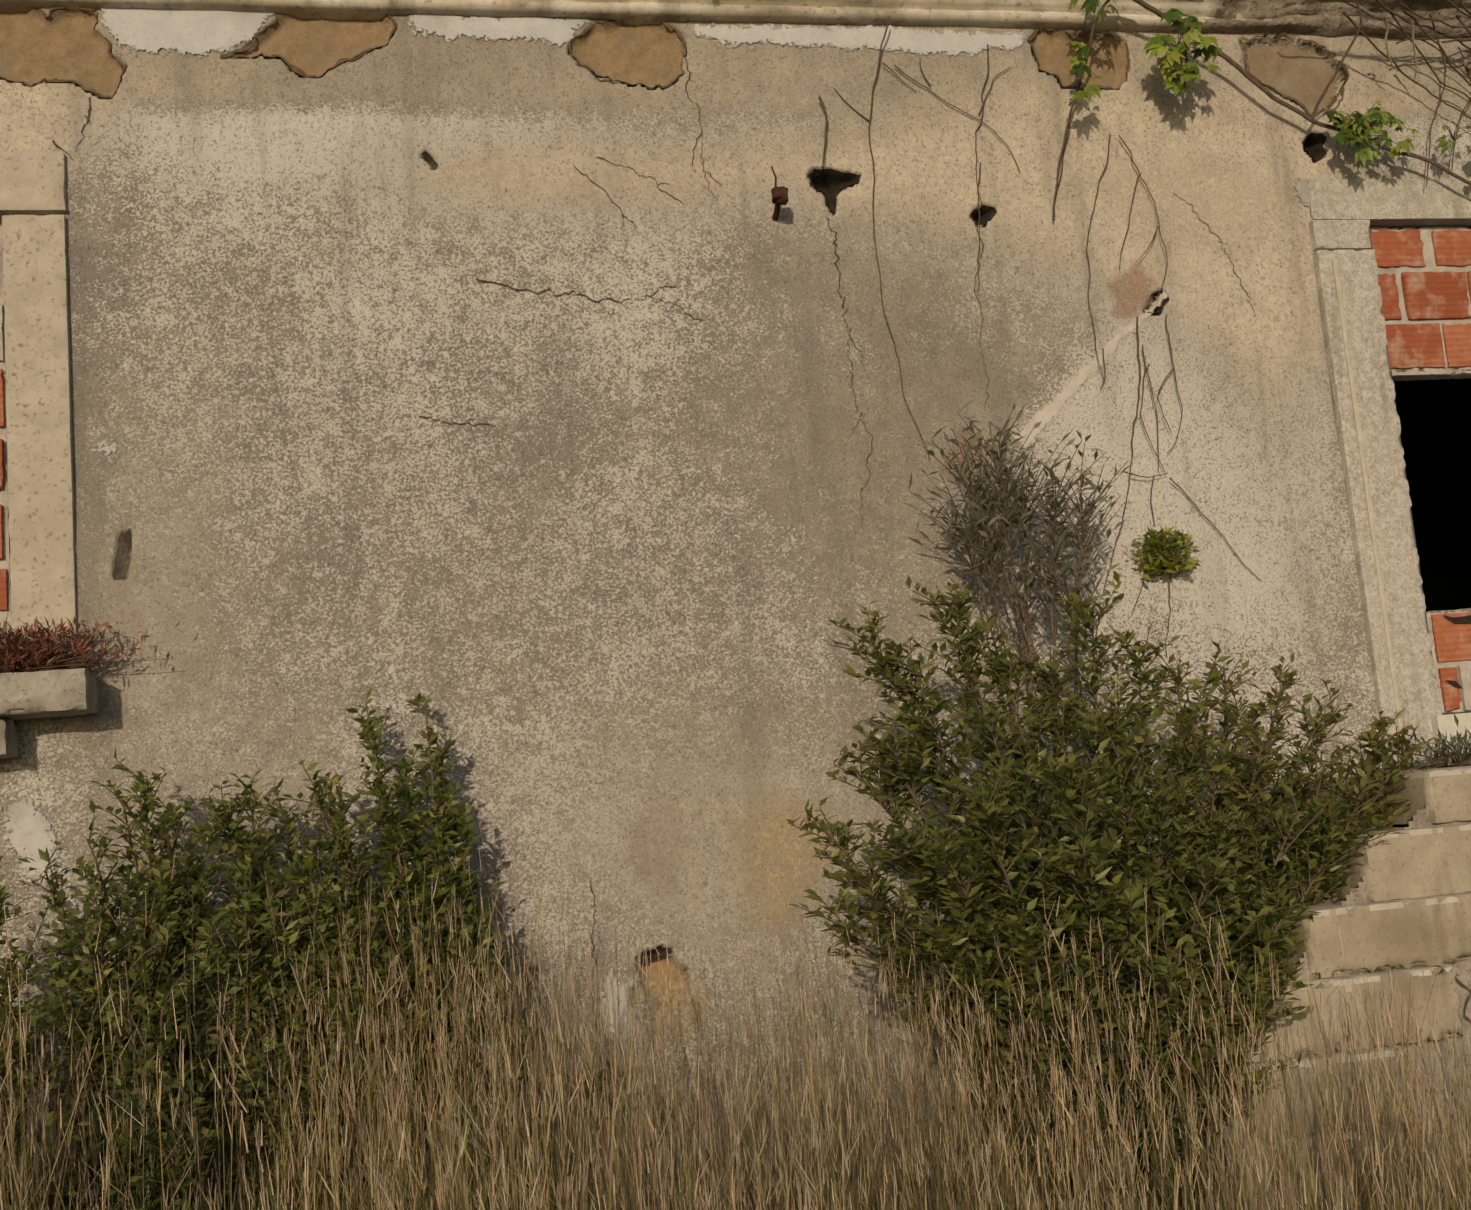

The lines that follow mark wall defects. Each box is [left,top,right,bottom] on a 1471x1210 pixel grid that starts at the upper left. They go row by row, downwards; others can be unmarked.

spalling [0,7,1131,99]
spalling [808,168,861,213]
spalling [971,205,997,225]
crack [1174,193,1254,311]
crack [477,279,703,321]
crack [974,224,990,404]
crack [827,217,873,530]
peeling [597,948,690,1045]
crack [1455,977,1471,1023]